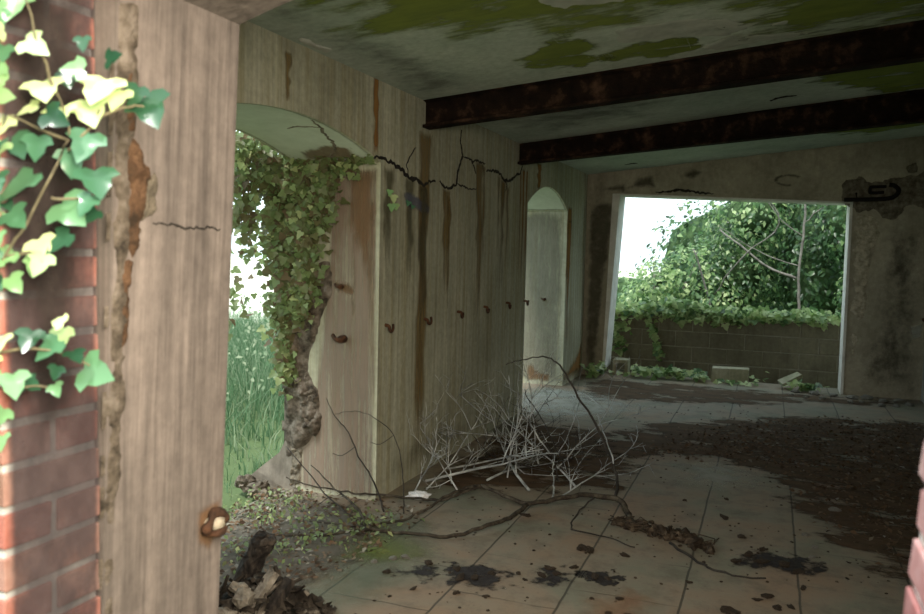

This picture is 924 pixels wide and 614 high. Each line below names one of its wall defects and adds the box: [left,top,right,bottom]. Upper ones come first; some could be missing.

crack [287,120,351,159]
crack [373,130,523,197]
spalling [841,162,924,220]
crack [153,222,221,231]
spalling [100,3,158,524]
spalling [251,261,332,490]